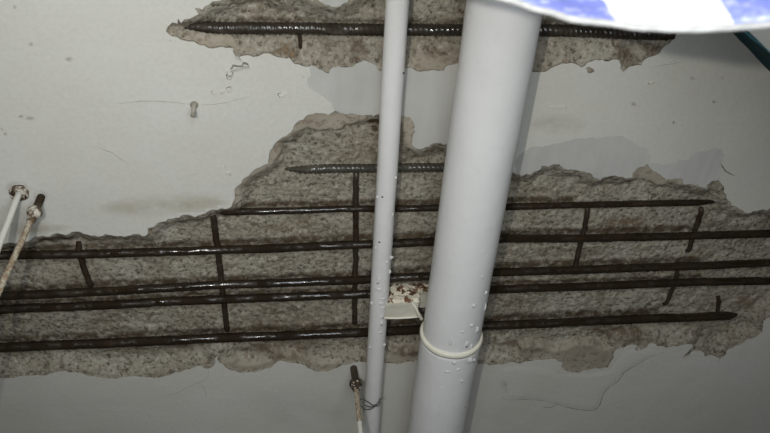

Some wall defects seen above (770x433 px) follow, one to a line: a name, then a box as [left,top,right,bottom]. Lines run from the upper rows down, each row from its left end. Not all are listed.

spalling [532,14,677,73]
spalling [0,0,386,379]
spalling [384,0,466,364]
corrosion [219,200,374,213]
corrosion [500,219,692,235]
corrosion [84,234,372,249]
spalling [477,136,770,373]
corrosion [3,270,371,291]
corrosion [484,308,656,321]
corrosion [0,322,369,342]